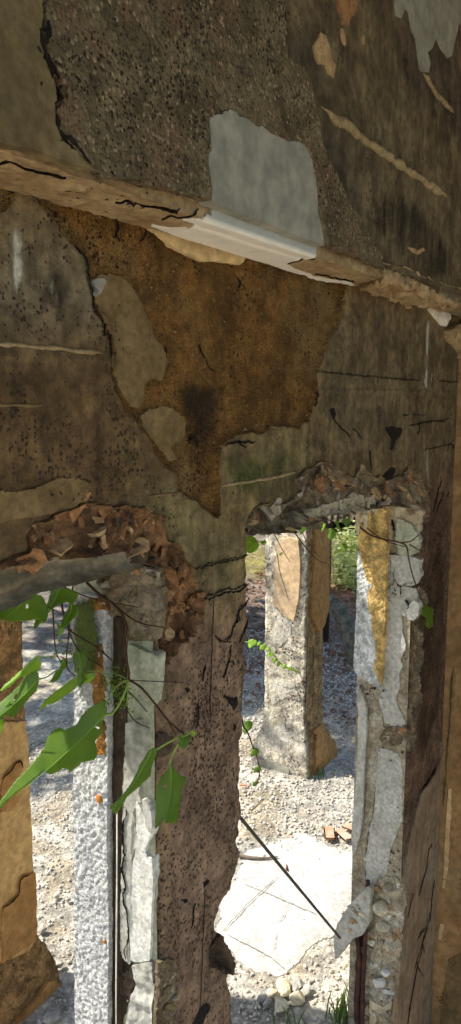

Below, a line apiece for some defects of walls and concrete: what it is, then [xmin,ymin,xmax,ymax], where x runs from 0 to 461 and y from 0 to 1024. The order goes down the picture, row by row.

crack [41,20,60,79]
crack [0,160,66,180]
crack [54,105,91,164]
crack [115,199,199,242]
peeling [0,0,385,269]
spalling [36,198,347,518]
damp [182,388,219,437]
crack [329,410,372,469]
crack [194,554,250,728]
corrosion [91,644,114,755]
spalling [0,477,206,1024]
peeling [245,462,444,1024]